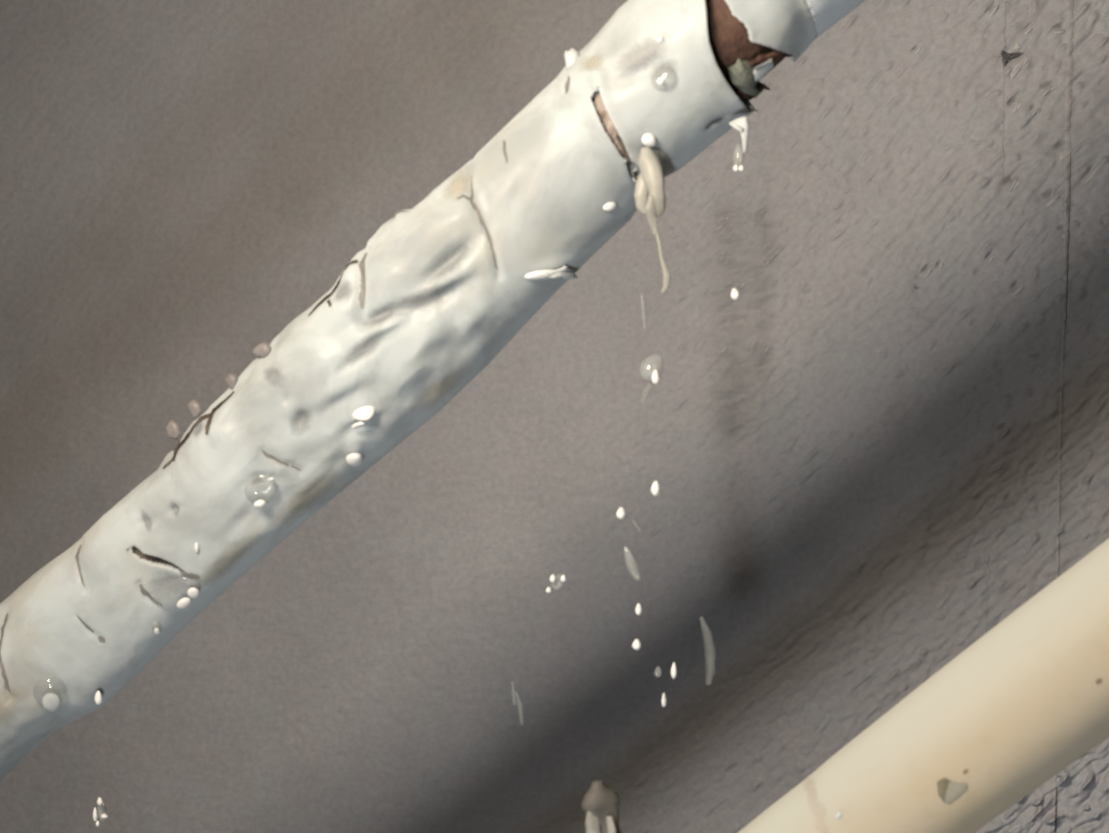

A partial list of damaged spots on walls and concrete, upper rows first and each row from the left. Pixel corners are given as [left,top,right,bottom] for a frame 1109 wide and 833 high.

crack [594,91,632,175]
peeling [937,778,967,803]